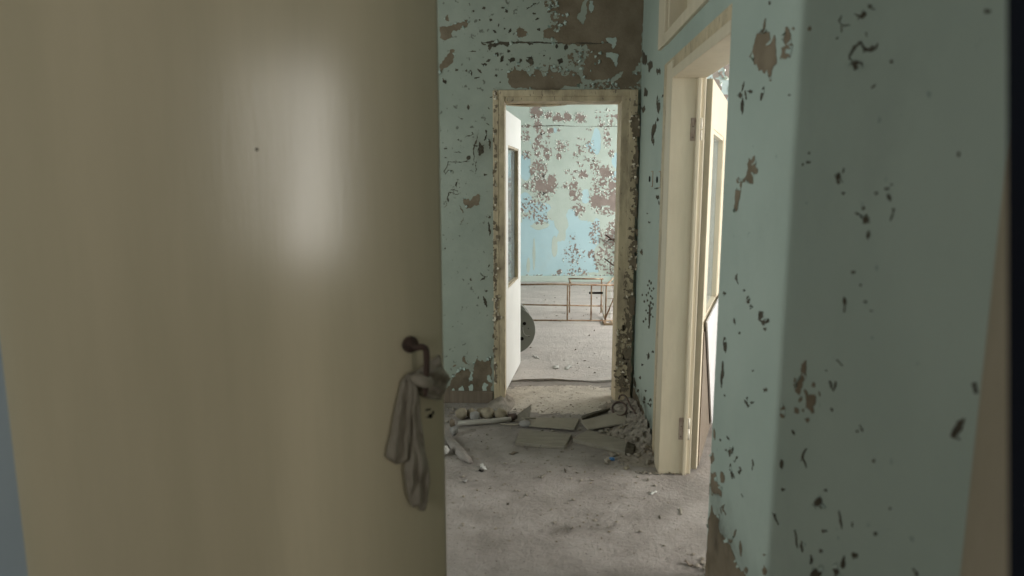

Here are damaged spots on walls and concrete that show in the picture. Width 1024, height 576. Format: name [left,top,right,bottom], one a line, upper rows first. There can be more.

peeling [710,18,811,114]
peeling [438,0,664,432]
peeling [733,155,758,213]
peeling [779,360,837,423]
spalling [705,429,748,576]